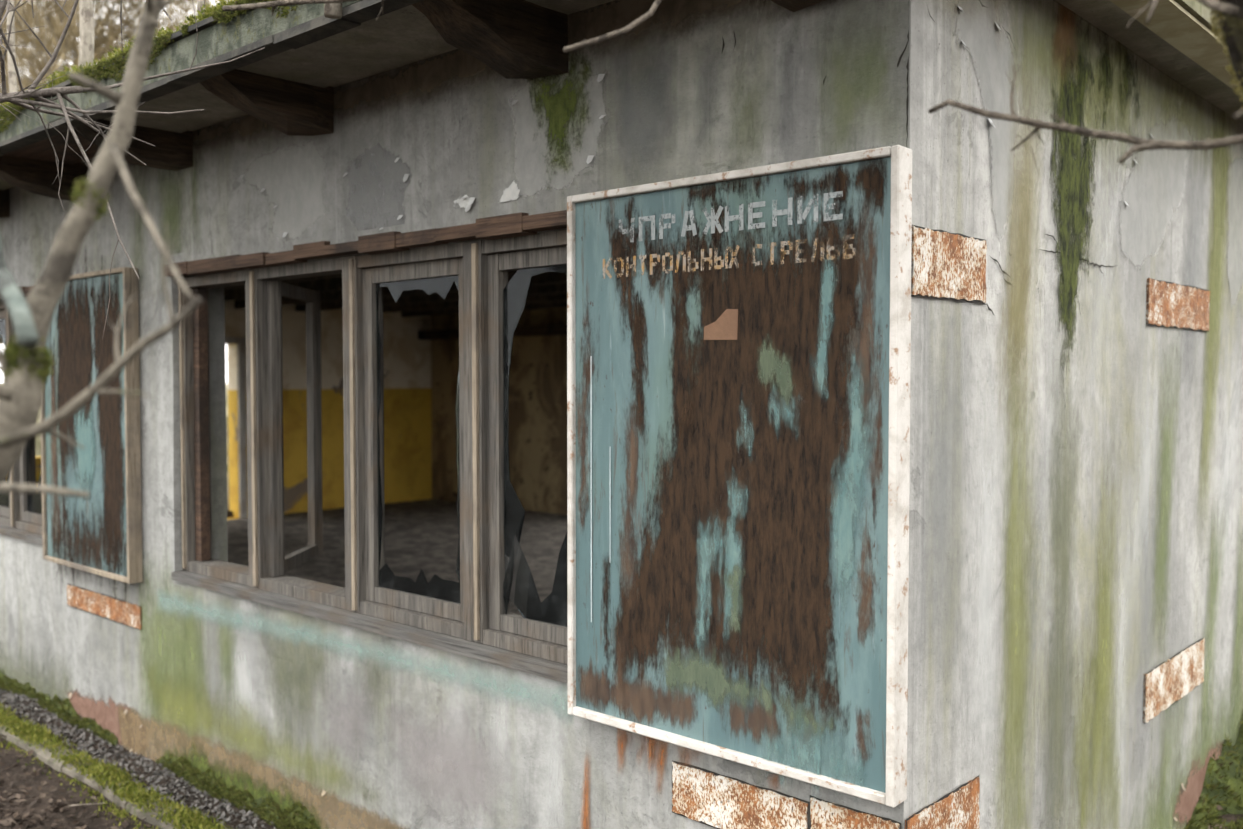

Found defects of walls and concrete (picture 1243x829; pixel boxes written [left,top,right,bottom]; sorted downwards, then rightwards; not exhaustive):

water stain [1202,544,1218,728]
water stain [1234,571,1243,685]